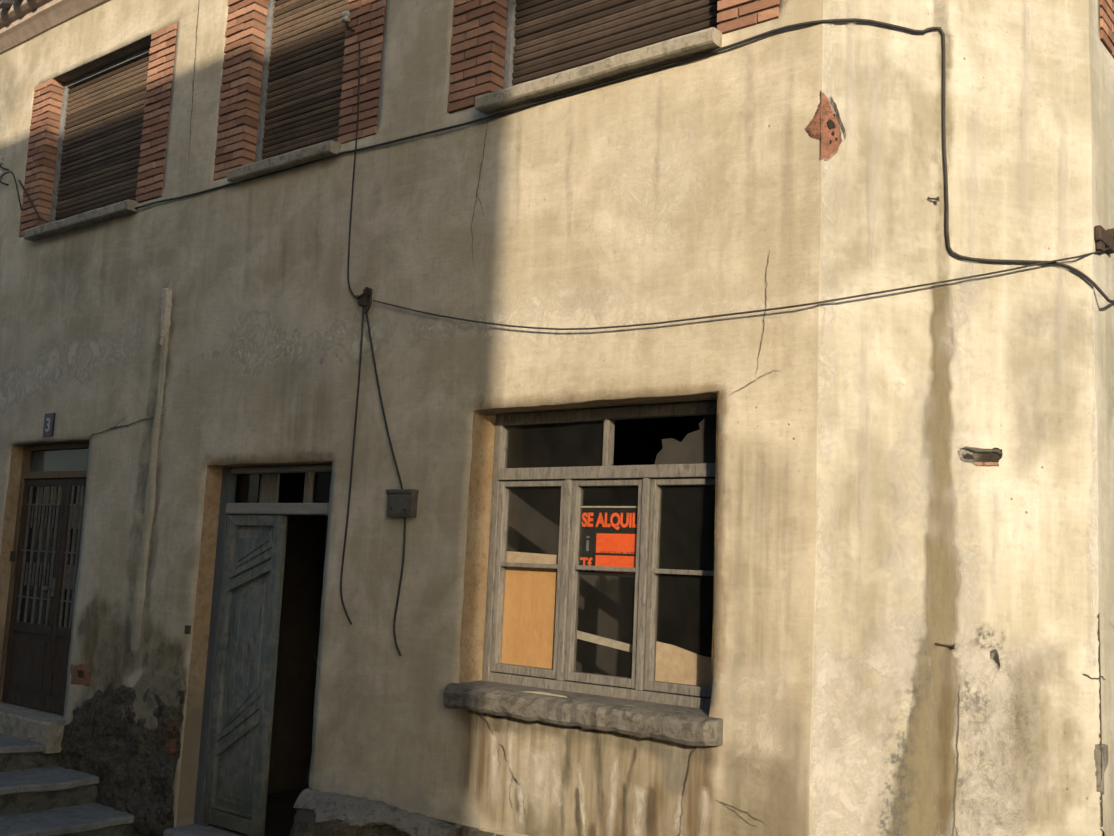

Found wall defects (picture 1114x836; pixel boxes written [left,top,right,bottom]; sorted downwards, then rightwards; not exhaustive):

spalling [804,91,846,161]
crack [471,123,488,265]
damp [811,280,1054,836]
crack [1083,613,1114,745]
flaking render [57,664,186,836]
crack [477,713,527,822]
damp [481,722,600,836]
damp [610,734,657,836]
crack [677,746,696,836]
damp [677,791,708,836]
crack [715,800,767,826]
crack [1097,793,1105,827]